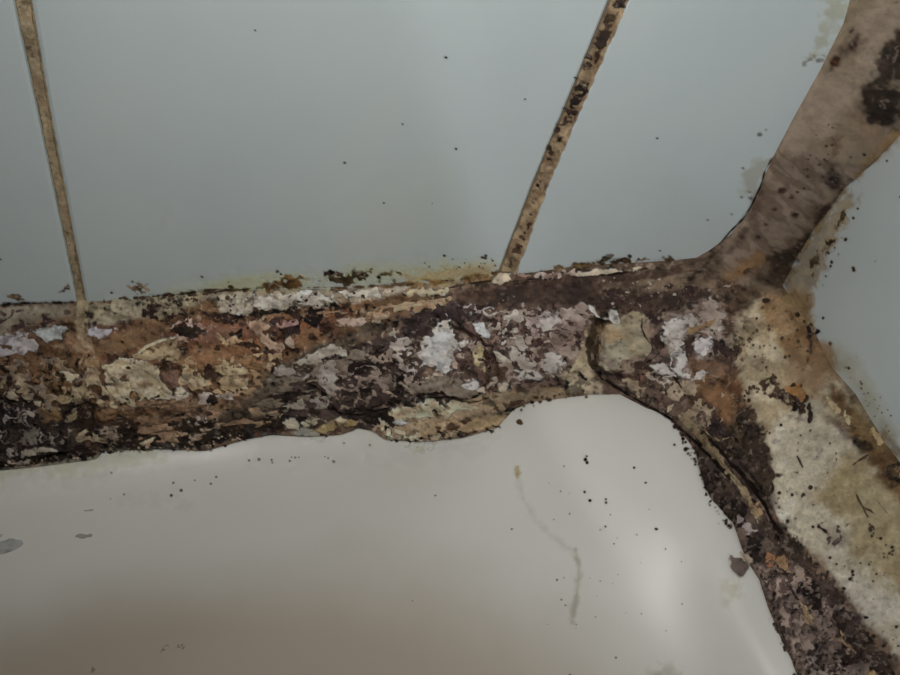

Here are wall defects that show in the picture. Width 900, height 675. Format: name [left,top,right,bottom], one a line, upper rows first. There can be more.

leakage [547,0,626,160]
leakage [862,31,900,126]
corrosion [801,191,846,277]
leakage [0,285,74,332]
corrosion [98,321,169,355]
leakage [0,356,320,469]
flaking render [0,285,764,535]
leakage [85,181,899,675]
corrosion [687,356,737,420]
peeling [826,396,850,425]
corrosion [853,425,900,482]
flaking render [730,552,878,675]